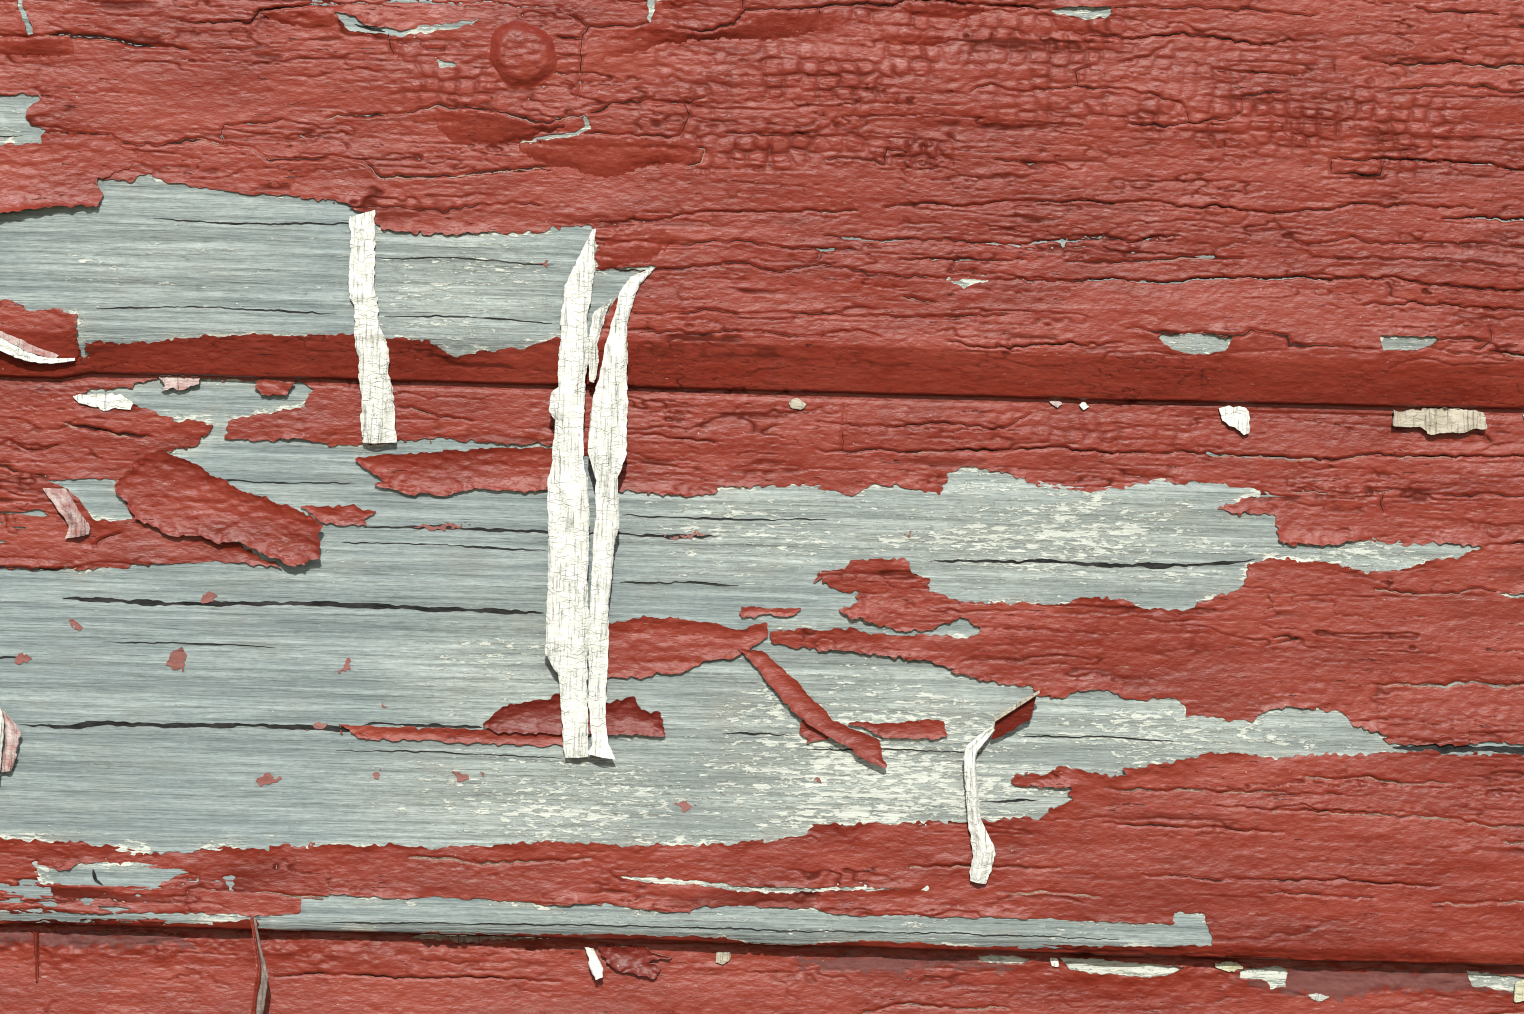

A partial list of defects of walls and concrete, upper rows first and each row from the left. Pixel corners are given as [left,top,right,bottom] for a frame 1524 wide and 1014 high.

crack [12,3,332,50]
crack [327,0,959,167]
crack [970,6,1314,128]
crack [1362,7,1524,93]
crack [44,118,551,214]
crack [595,157,1524,358]
peeling [0,93,1524,890]
crack [1103,776,1524,845]
peeling [0,876,1212,1014]
peeling [1215,961,1288,989]
peeling [1308,993,1329,1001]
peeling [1467,970,1524,1002]